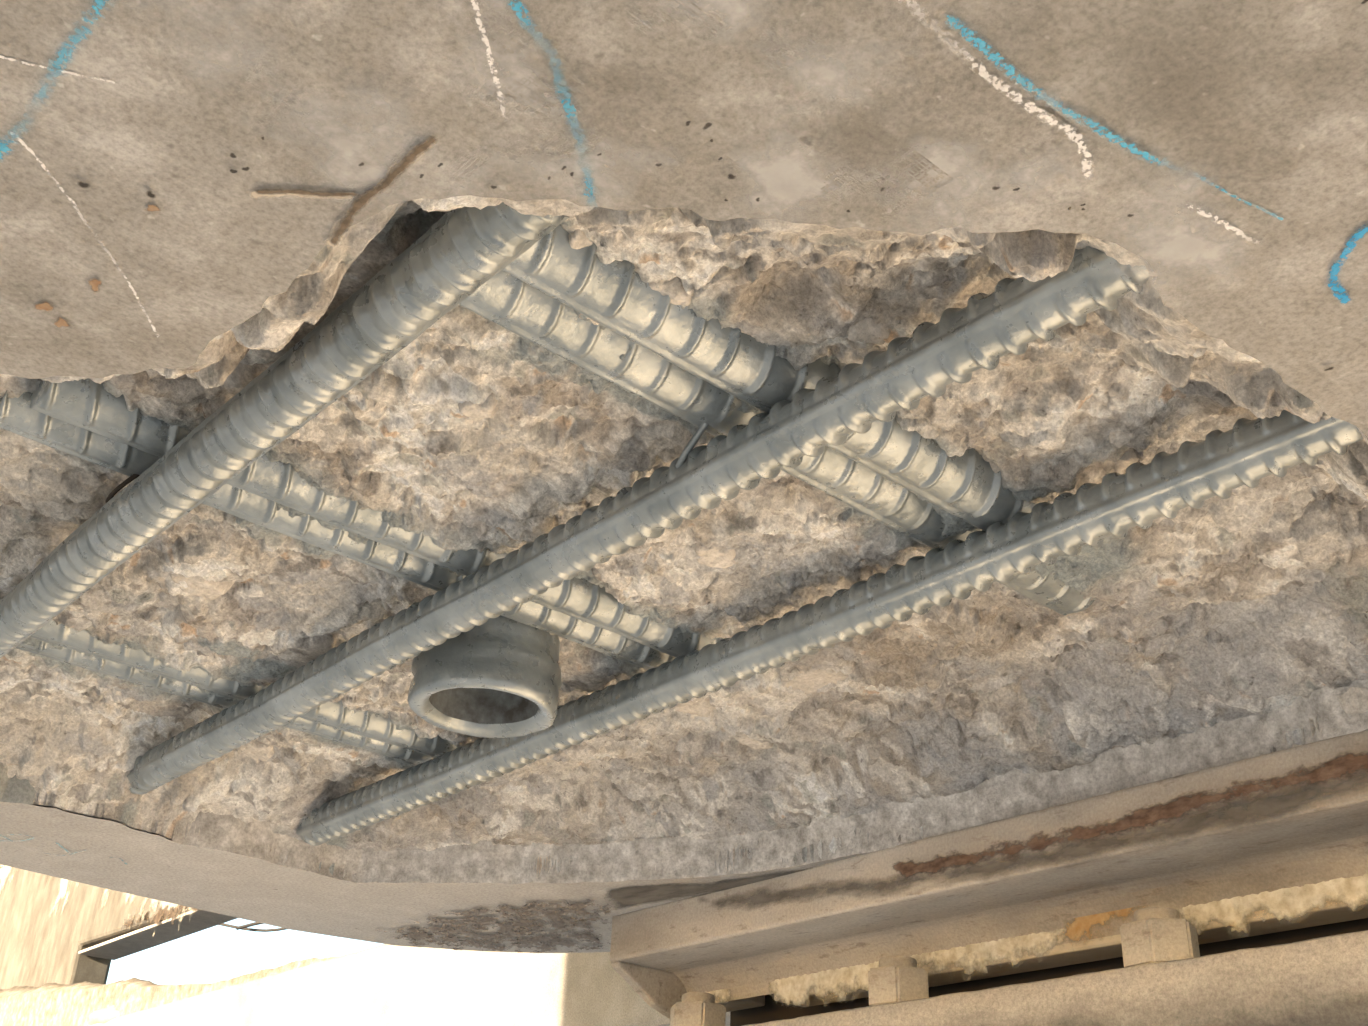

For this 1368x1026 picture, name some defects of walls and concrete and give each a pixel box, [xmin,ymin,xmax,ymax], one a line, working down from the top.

spalling [0,195,1368,884]
corrosion [893,753,1368,878]
efflorescence [0,864,13,893]
efflorescence [53,878,69,910]
efflorescence [126,893,192,919]
spalling [397,900,609,953]